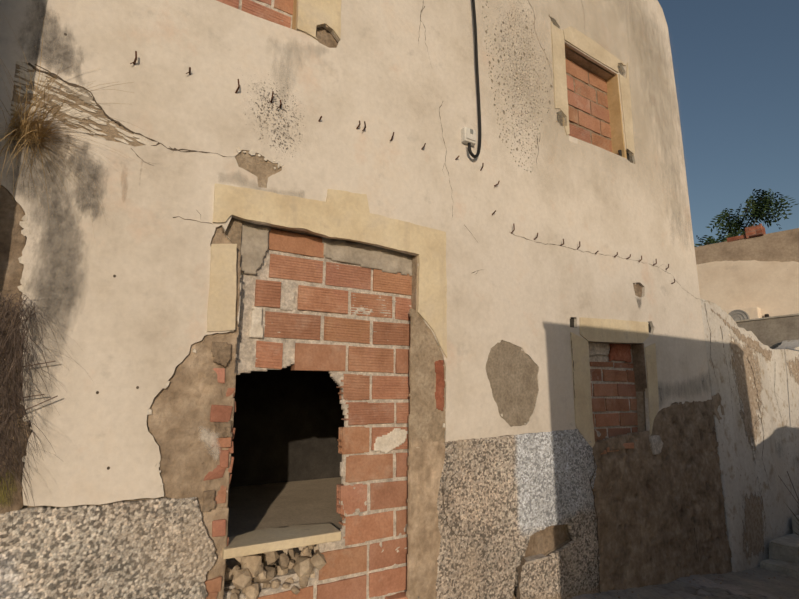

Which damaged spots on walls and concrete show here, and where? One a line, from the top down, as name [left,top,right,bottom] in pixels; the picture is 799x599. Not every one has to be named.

leakage [32,3,73,73]
peeling [6,61,150,147]
crack [28,63,236,166]
peeling [235,147,283,188]
leakage [245,80,306,157]
leakage [14,114,99,337]
peeling [0,185,33,514]
spalling [145,226,241,599]
spalling [486,340,538,427]
peeling [711,309,772,459]
peeling [787,355,799,384]
spalling [592,393,732,592]